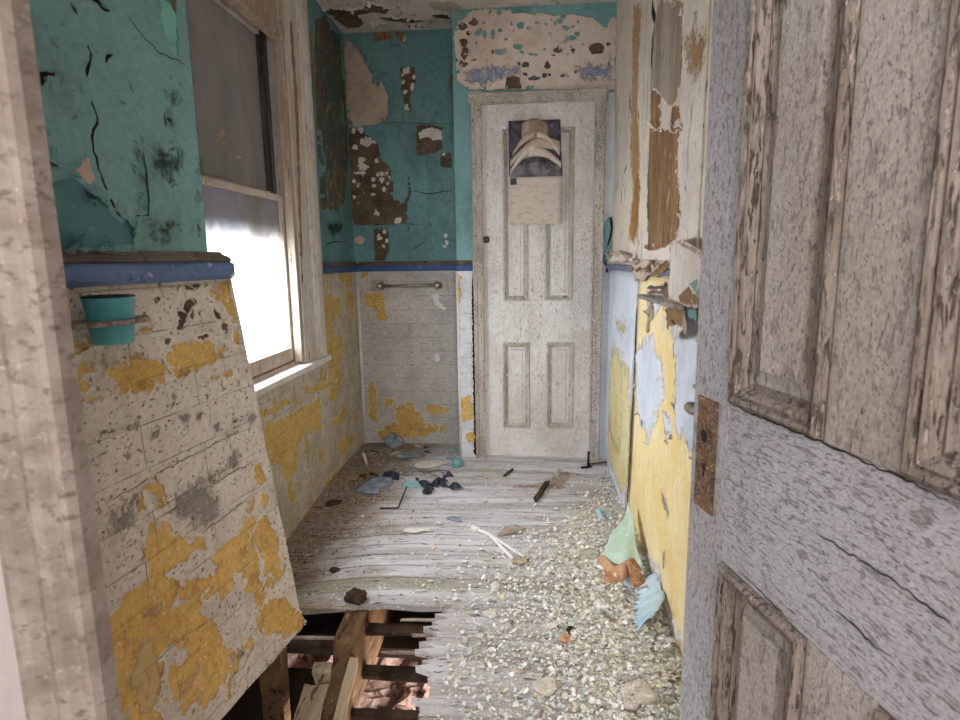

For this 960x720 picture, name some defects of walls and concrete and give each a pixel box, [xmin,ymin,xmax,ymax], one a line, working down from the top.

crack [40,40,154,226]
water stain [154,149,179,186]
peeling [312,0,617,261]
peeling [603,0,702,460]
peeling [73,279,243,408]
peeling [109,272,475,720]
peeling [469,600,561,666]
peeling [643,553,663,587]
peeling [662,600,682,648]
crack [740,571,788,619]
crack [835,610,895,659]
crack [817,533,960,632]